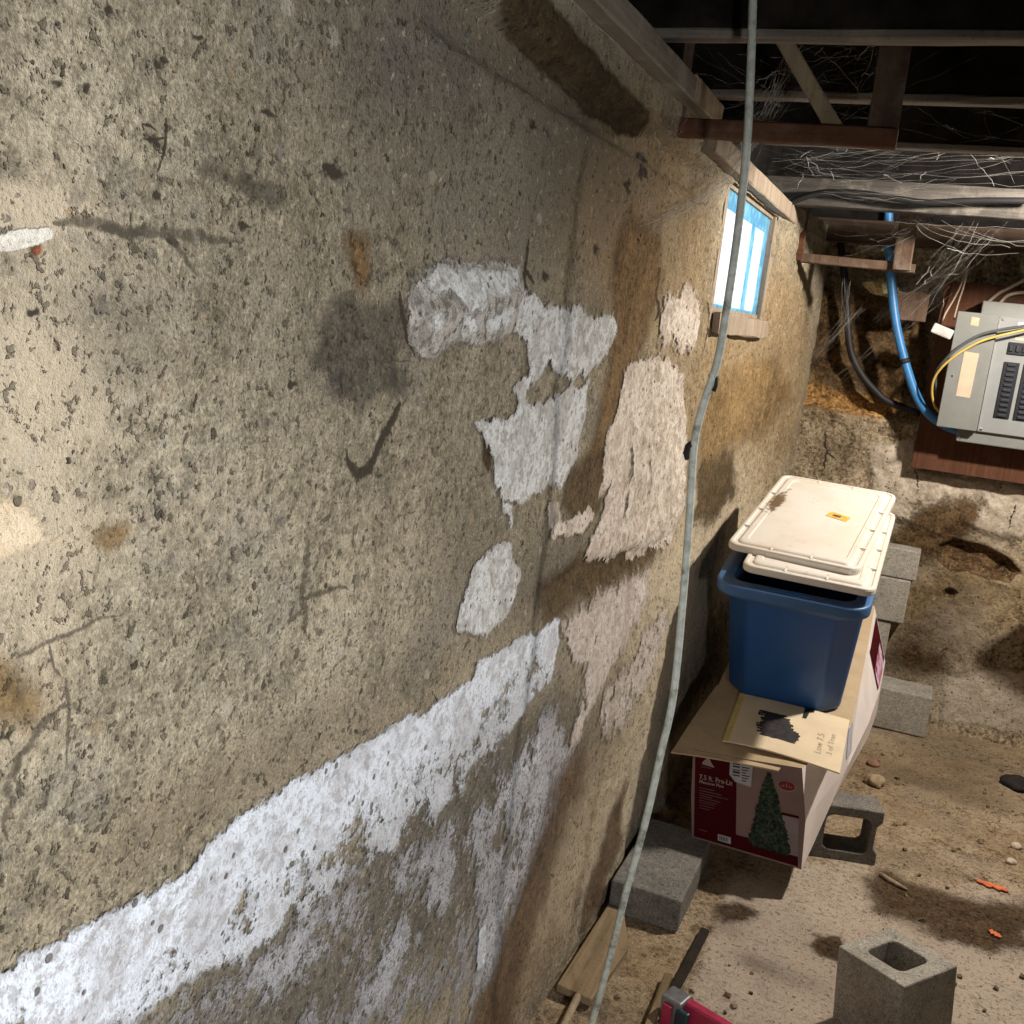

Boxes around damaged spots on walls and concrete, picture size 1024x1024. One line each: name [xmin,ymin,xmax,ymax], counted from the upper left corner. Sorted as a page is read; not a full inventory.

leakage [501,0,649,137]
crack [53,216,243,277]
rust [347,234,371,287]
leakage [313,292,408,409]
leakage [483,437,492,470]
peeling [467,276,702,564]
leakage [121,537,670,1024]